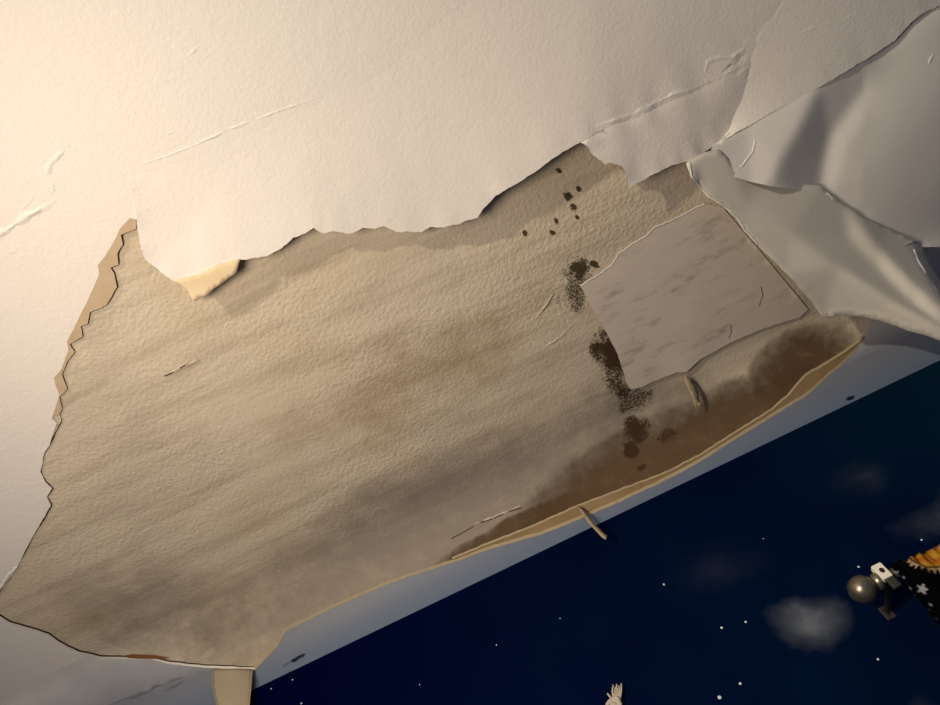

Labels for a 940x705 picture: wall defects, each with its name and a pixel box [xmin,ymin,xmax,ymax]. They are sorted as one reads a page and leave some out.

damp [562,186,582,219]
peeling [0,138,872,670]
damp [268,329,846,633]